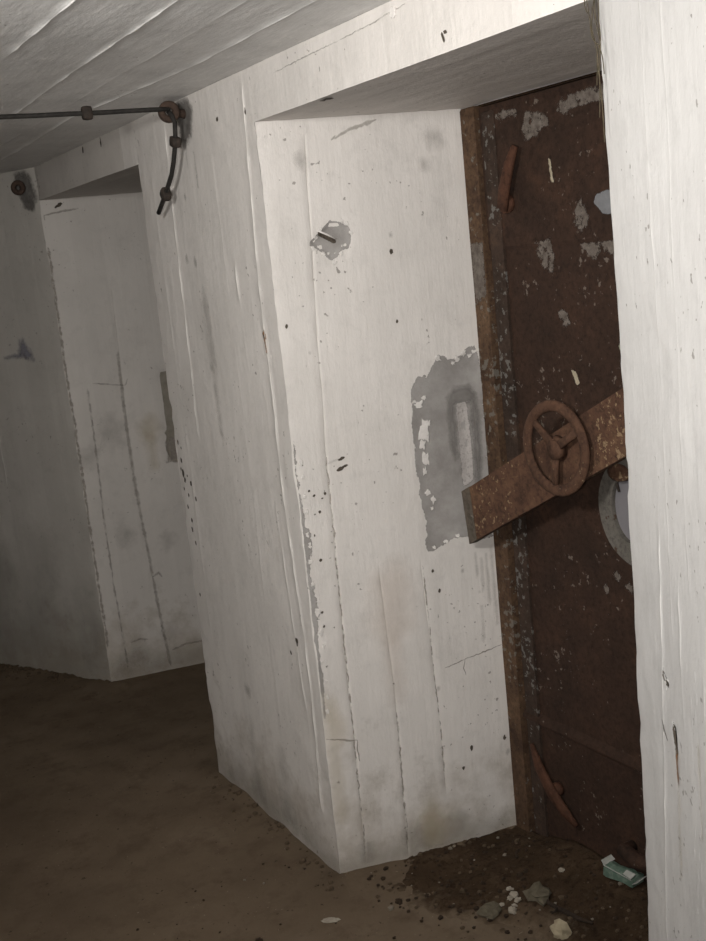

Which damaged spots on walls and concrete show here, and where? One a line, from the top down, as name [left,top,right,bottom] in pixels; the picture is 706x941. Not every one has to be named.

spalling [310,218,353,265]
peeling [411,346,488,551]